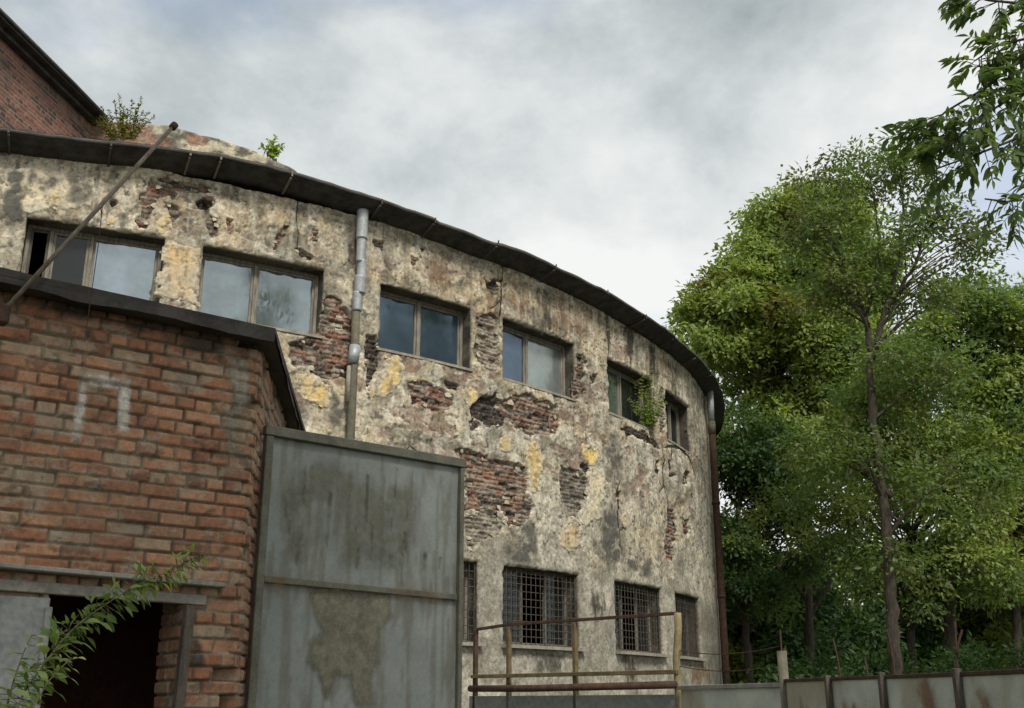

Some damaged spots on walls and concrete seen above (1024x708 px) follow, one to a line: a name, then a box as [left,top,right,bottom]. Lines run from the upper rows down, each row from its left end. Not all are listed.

peeling [135,177,232,306]
spalling [288,298,352,409]
spalling [472,314,500,374]
spalling [364,336,559,553]
spalling [557,443,619,552]
spalling [664,510,688,561]